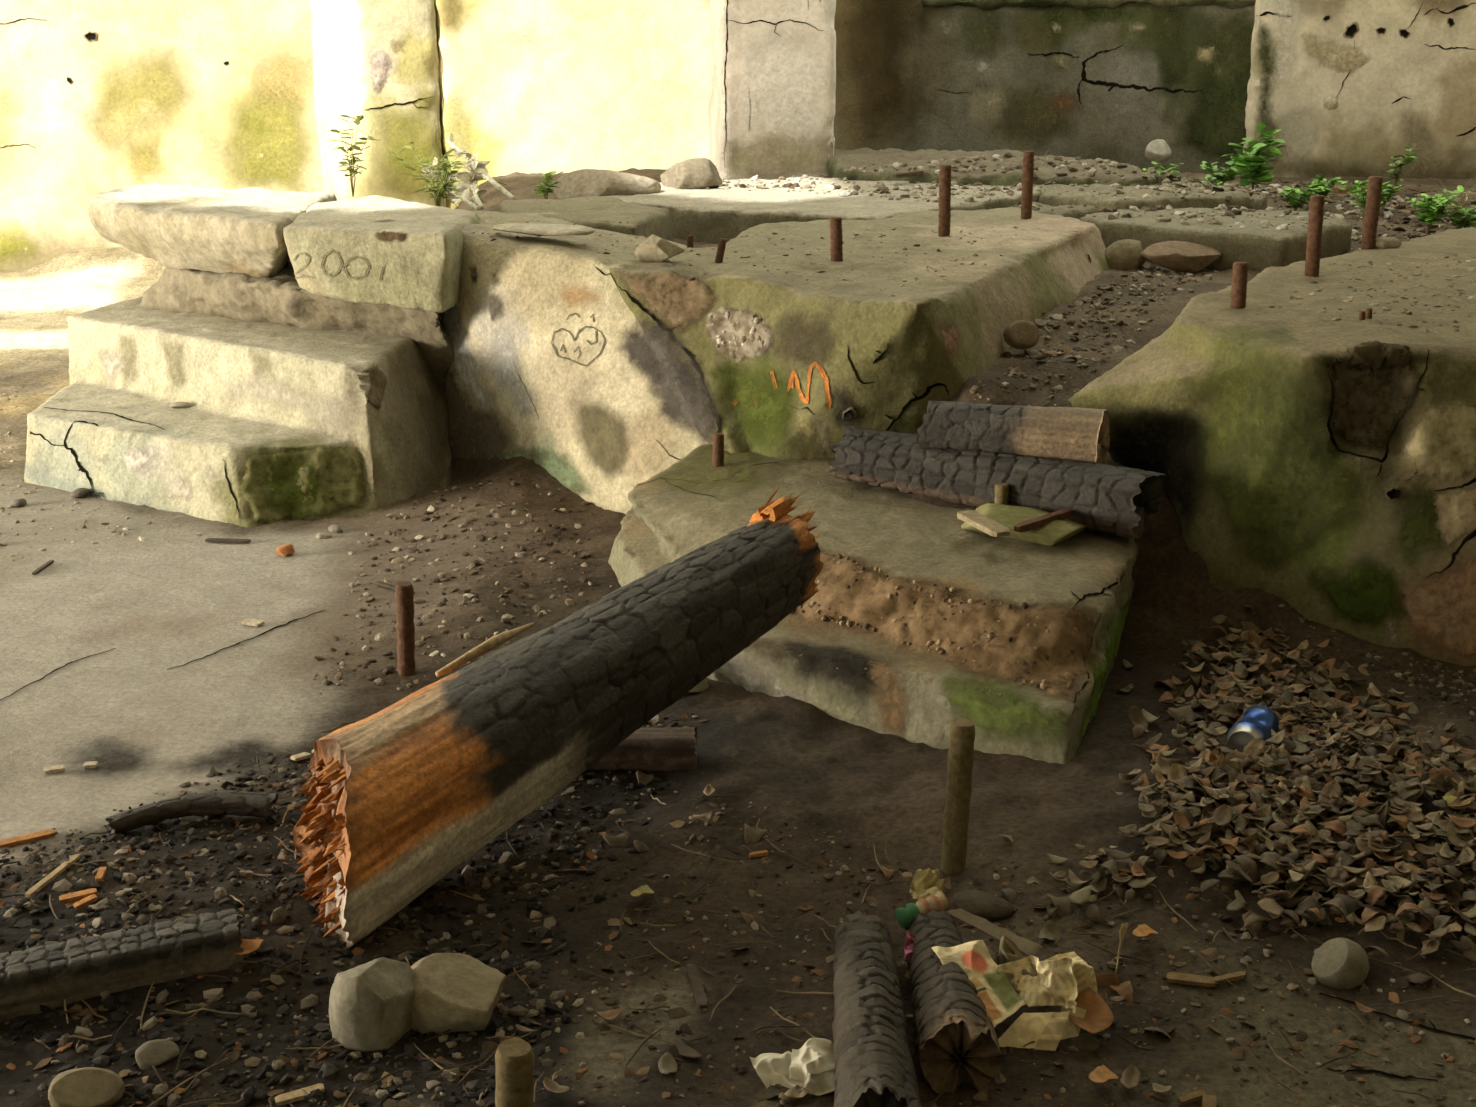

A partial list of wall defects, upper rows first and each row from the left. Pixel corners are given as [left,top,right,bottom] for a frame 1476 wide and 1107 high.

crack [724,0,823,160]
crack [1027,44,1202,103]
crack [30,407,165,500]
damp [1109,419,1195,526]
crack [1327,350,1476,492]
spalling [1333,340,1476,545]
crack [1427,530,1476,578]